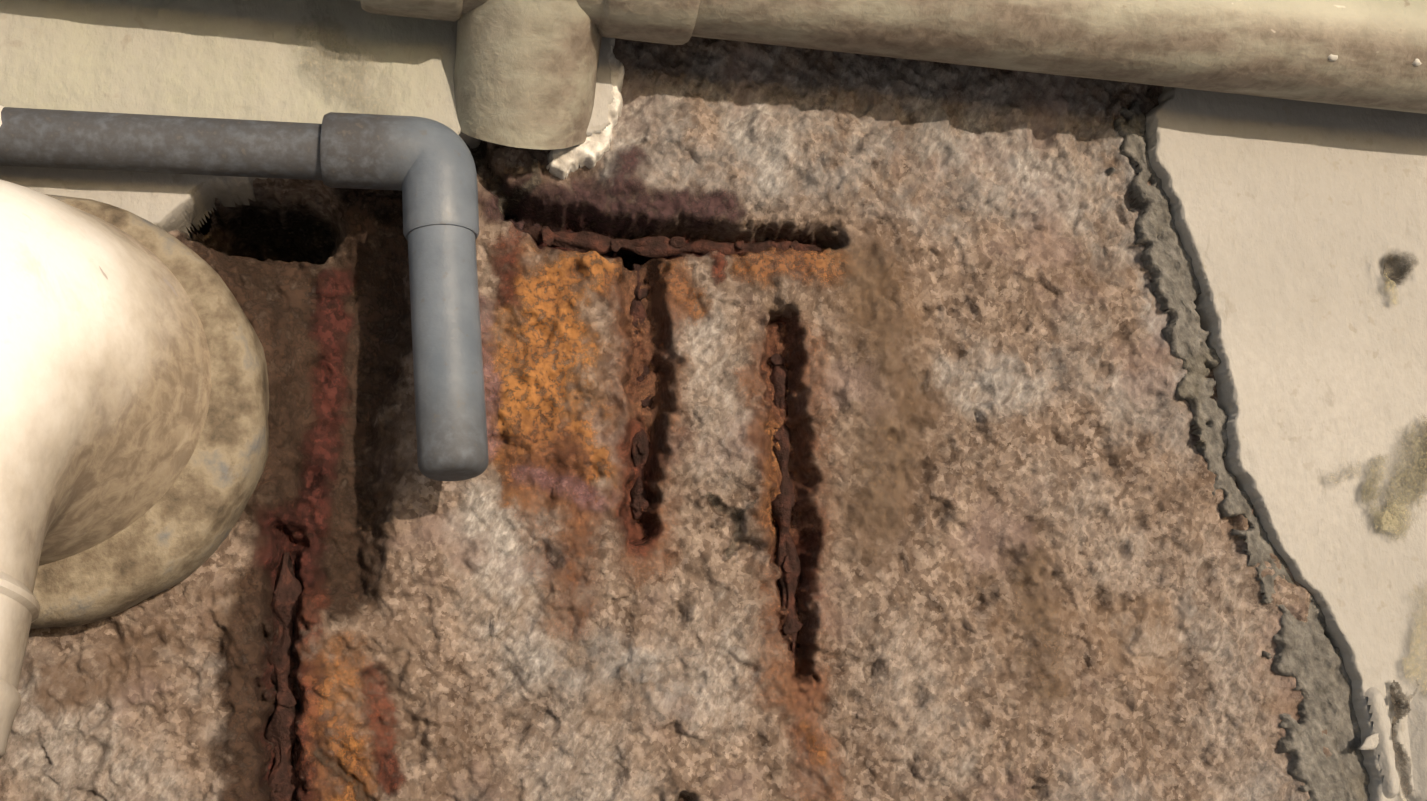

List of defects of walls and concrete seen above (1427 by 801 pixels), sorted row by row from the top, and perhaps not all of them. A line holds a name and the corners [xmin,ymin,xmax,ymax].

spalling [0,328,322,801]
spalling [169,178,359,327]
corrosion [177,188,412,801]
corrosion [480,145,853,566]
corrosion [740,315,831,764]
spalling [290,36,1379,801]
damp [1330,422,1427,536]
hole [1383,254,1418,304]